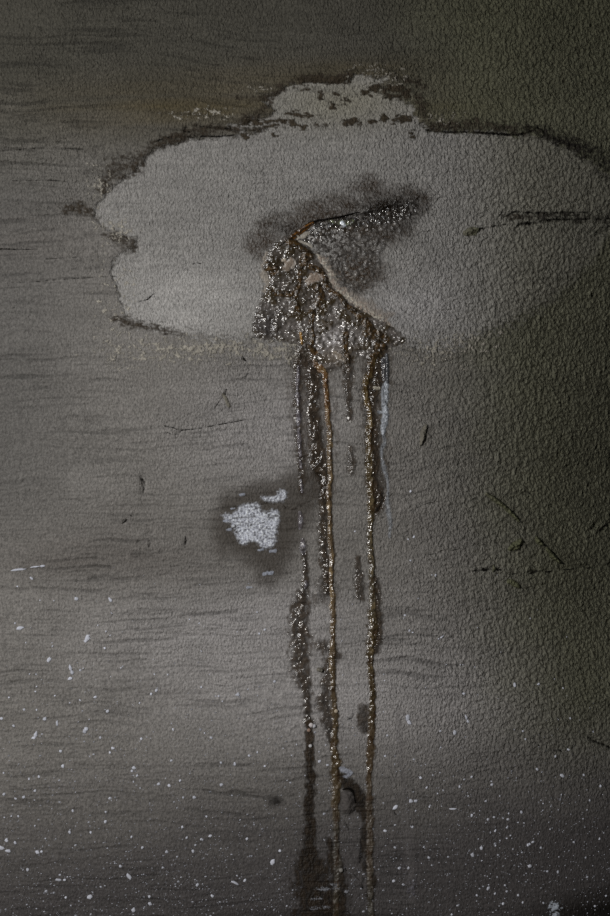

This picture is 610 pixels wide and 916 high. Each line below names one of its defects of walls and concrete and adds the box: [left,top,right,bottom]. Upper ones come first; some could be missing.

crack [306,212,360,225]
peeling [63,64,610,376]
efflorescence [223,490,286,553]
corrosion [289,337,385,916]